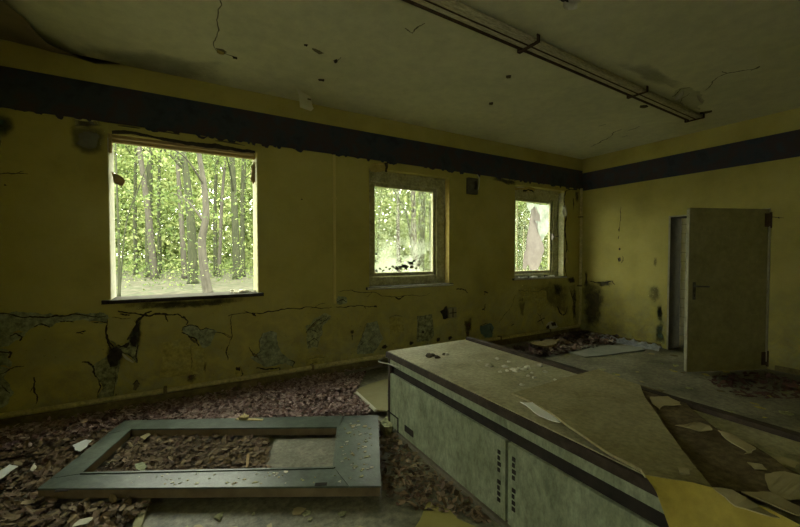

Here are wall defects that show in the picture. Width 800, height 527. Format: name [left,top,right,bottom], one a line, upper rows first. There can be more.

crack [213,0,231,56]
peeling [112,125,255,153]
crack [118,311,188,325]
crack [225,290,426,358]
peeling [0,311,152,408]